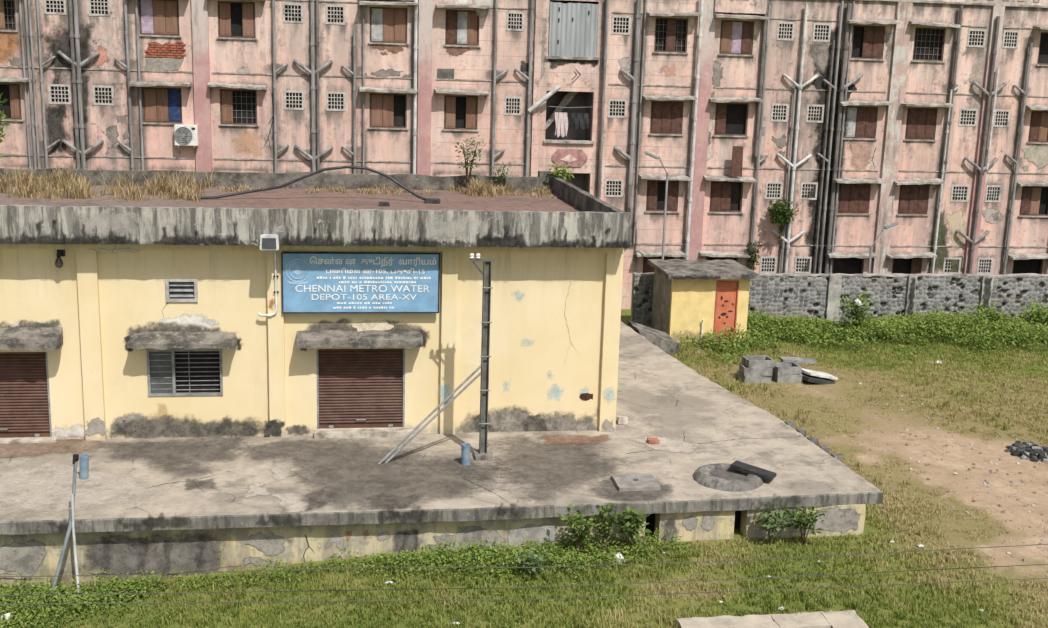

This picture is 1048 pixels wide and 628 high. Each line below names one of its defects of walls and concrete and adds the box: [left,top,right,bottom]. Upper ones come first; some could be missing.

flaking render [144,41,186,72]
leakage [45,26,93,161]
leakage [804,26,872,274]
flaking render [1009,144,1048,172]
leakage [21,212,135,244]
leakage [162,223,238,245]
leakage [285,227,344,246]
flaking render [52,413,191,439]
leakage [0,416,309,458]
leakage [187,480,215,489]
leakage [257,491,326,529]
flaking render [0,535,46,576]